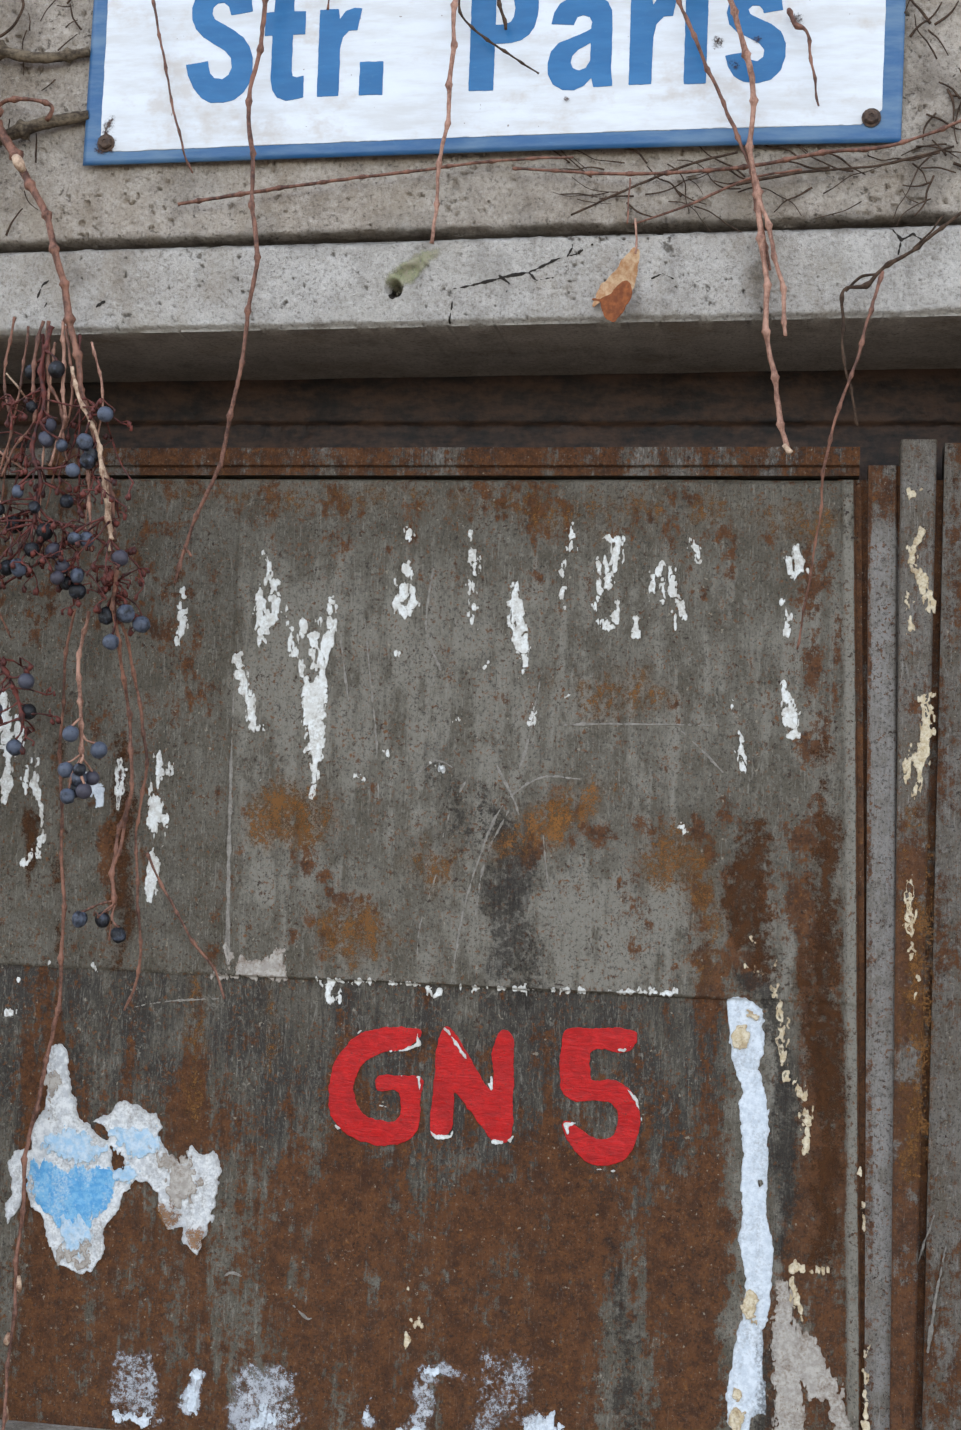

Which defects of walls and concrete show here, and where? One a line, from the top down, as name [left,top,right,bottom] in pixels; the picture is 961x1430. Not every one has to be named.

peeling [506,581,531,675]
peeling [591,534,641,639]
peeling [648,560,687,631]
peeling [0,691,46,867]
peeling [225,550,338,965]
rust [246,780,334,851]
rust [486,775,615,861]
peeling [780,680,801,740]
peeling [902,692,936,800]
rust [636,736,851,1278]
rust [892,802,937,1185]
peeling [725,960,870,1430]